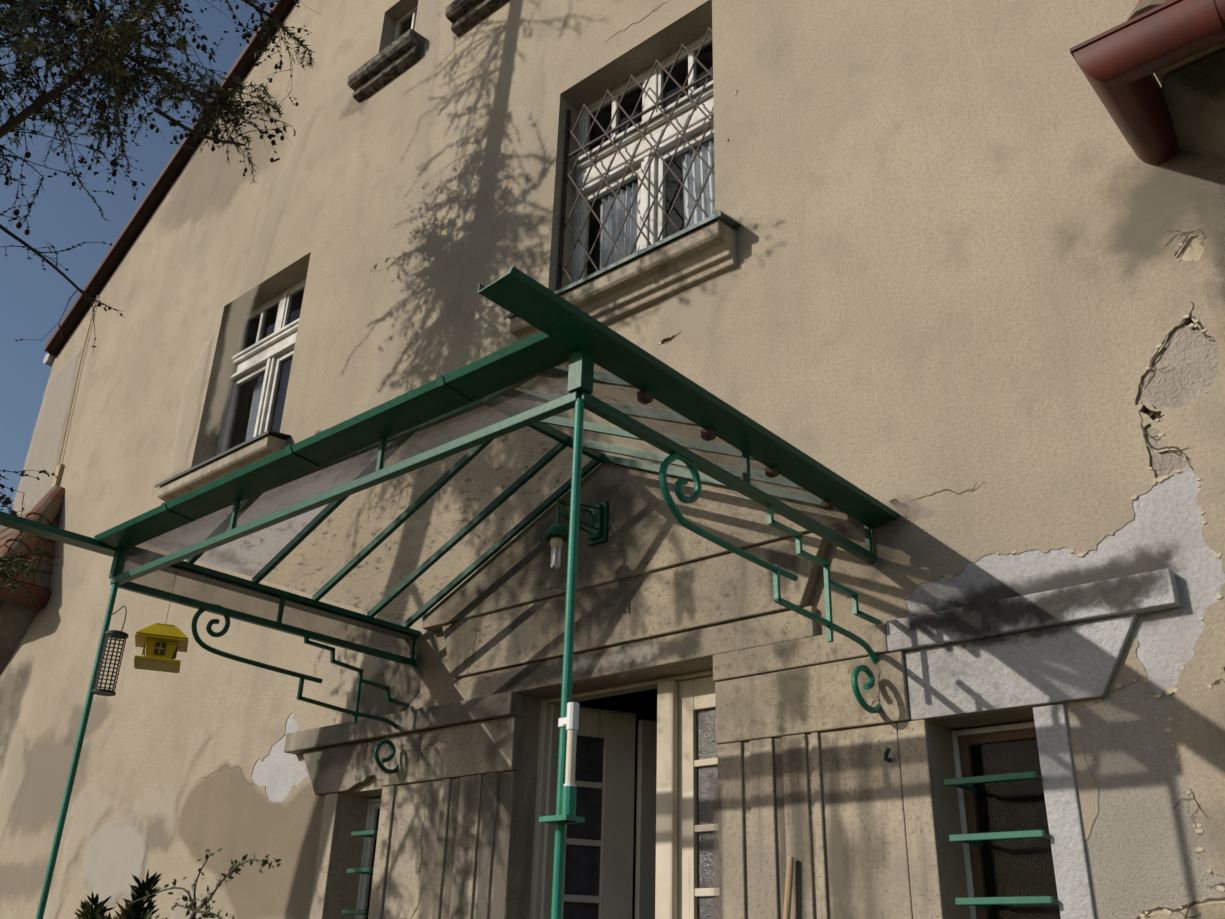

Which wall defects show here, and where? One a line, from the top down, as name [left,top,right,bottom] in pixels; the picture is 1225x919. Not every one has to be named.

damp [1145,154,1225,266]
crack [1164,229,1225,270]
crack [911,481,984,501]
damp [443,488,700,698]
damp [907,550,1171,647]
spalling [904,314,1225,919]
damp [359,655,422,716]
peeling [252,714,309,805]
damp [420,774,511,919]
damp [774,739,806,919]
crack [1173,789,1208,834]
crack [1136,882,1225,919]